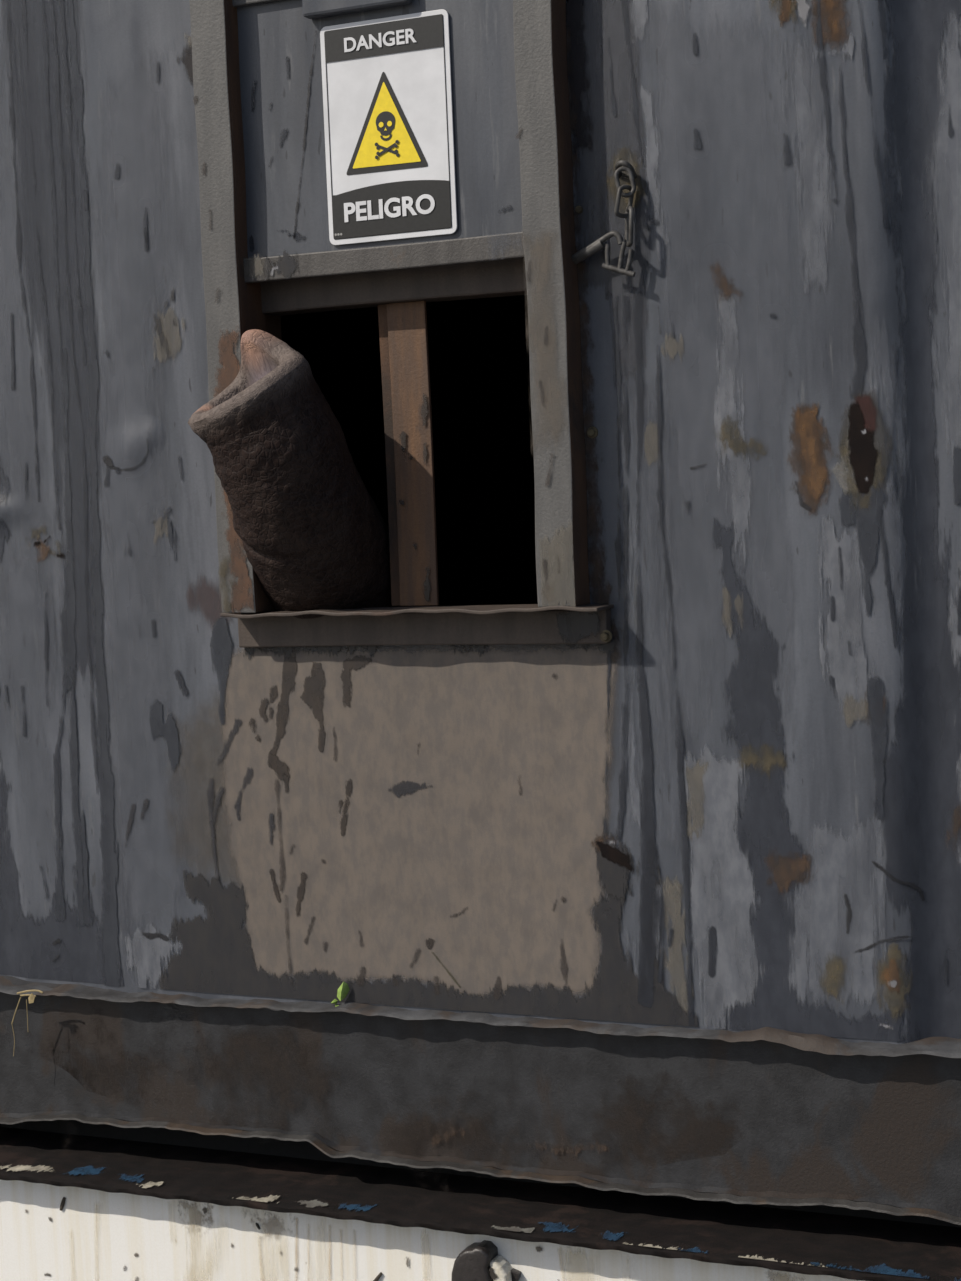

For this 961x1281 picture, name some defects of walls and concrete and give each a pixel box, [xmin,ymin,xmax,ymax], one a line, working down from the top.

rust [771,0,854,58]
rust [213,330,240,397]
peeling [714,294,752,565]
rust [790,405,831,513]
peeling [870,346,916,625]
rust [188,489,254,625]
peeling [819,518,870,721]
peeling [125,923,183,988]
peeling [655,746,761,1029]
peeling [789,818,886,1006]
peeling [0,1164,163,1188]
peeling [298,1200,378,1211]